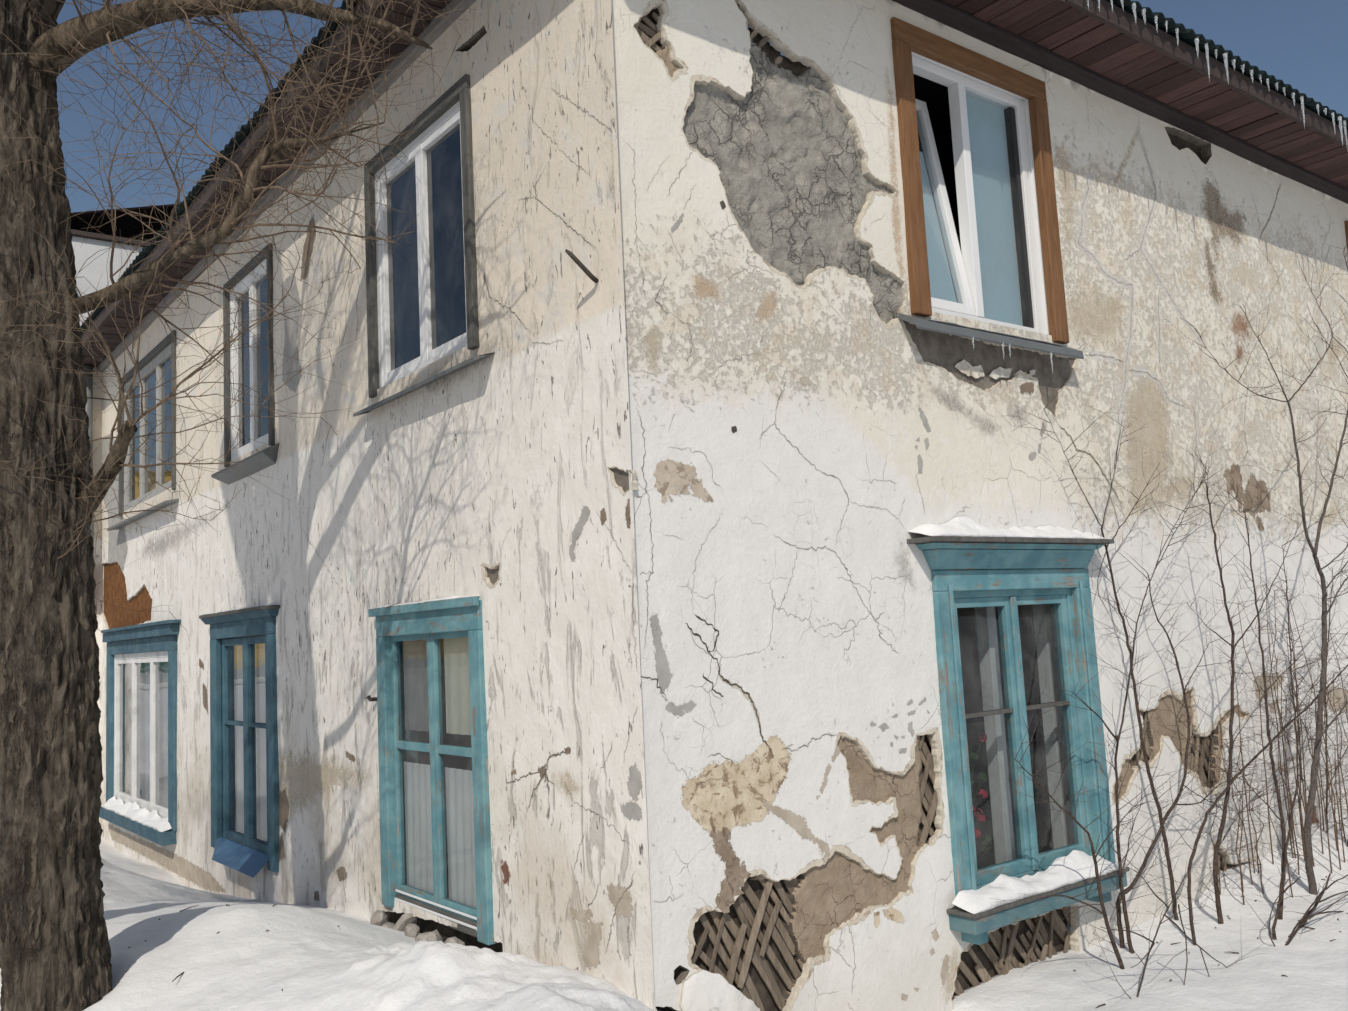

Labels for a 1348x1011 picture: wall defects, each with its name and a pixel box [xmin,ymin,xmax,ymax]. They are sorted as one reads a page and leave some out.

crack [553,90,773,382]
spalling [633,0,1079,461]
spalling [102,474,152,629]
peeling [569,506,607,562]
spalling [607,466,638,528]
peeling [653,458,713,504]
crack [598,400,833,785]
crack [759,384,925,656]
peeling [1224,463,1271,532]
spalling [1112,672,1284,806]
crack [506,750,674,954]
spalling [674,697,945,1011]